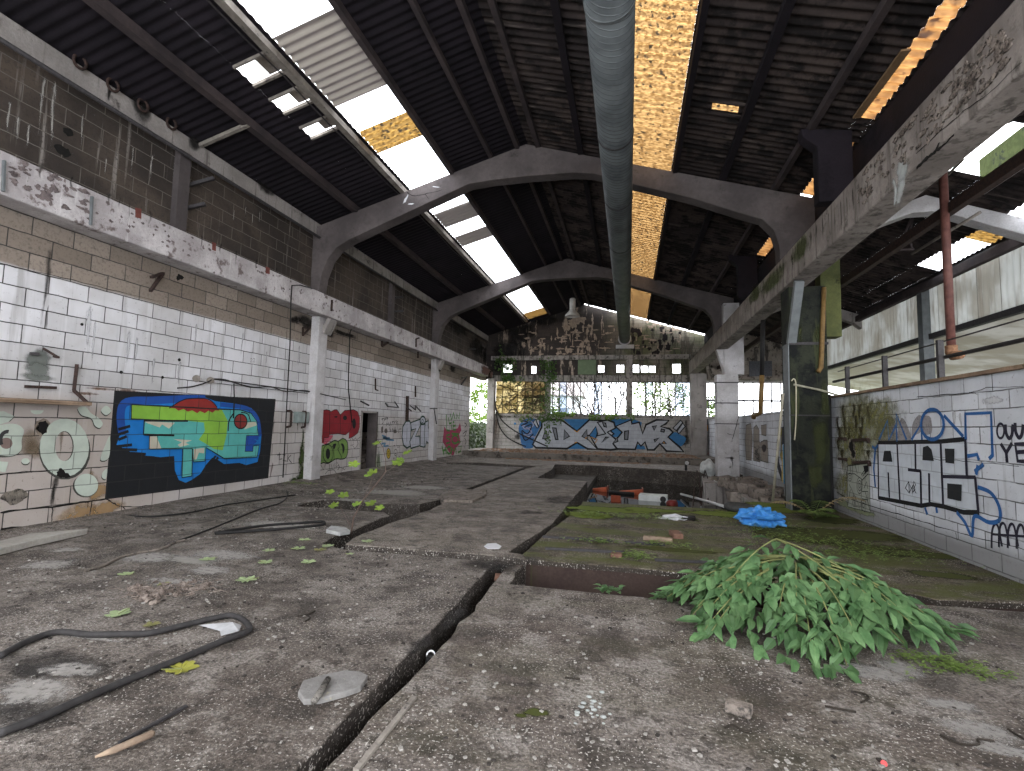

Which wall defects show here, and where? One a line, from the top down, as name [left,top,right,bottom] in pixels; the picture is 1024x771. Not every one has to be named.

peeling [8,161,211,256]
peeling [518,317,615,356]
peeling [630,321,682,355]
water stain [836,404,869,463]